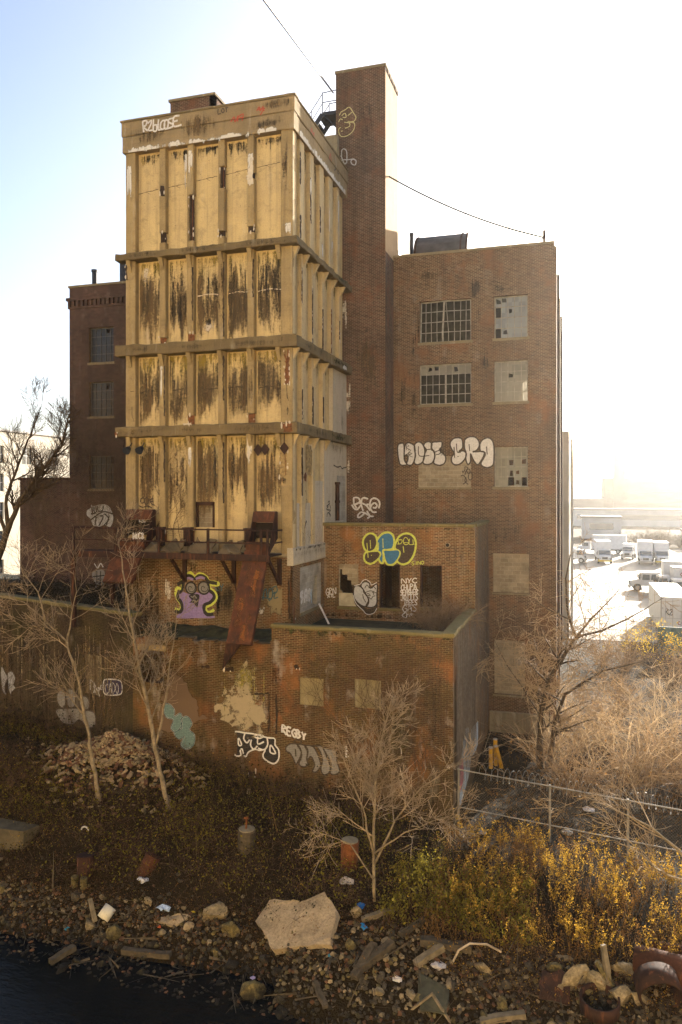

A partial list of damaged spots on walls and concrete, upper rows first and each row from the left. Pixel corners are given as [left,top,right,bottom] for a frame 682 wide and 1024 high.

water stain [128,115,287,187]
water stain [143,266,187,329]
water stain [203,259,281,334]
water stain [140,363,218,412]
water stain [140,441,281,517]